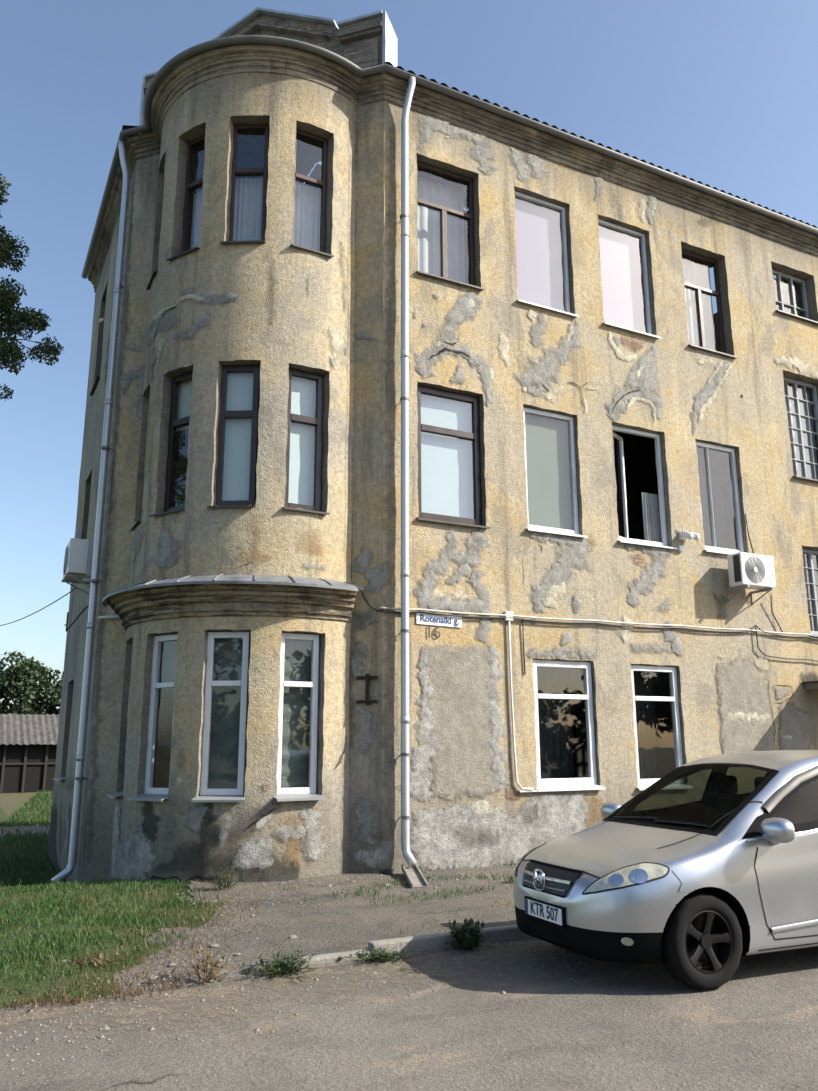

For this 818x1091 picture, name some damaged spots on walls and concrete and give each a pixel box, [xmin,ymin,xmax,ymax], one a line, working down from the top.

spalling [608,332,655,379]
peeling [543,582,566,609]
peeling [474,788,520,815]
spalling [347,799,393,875]